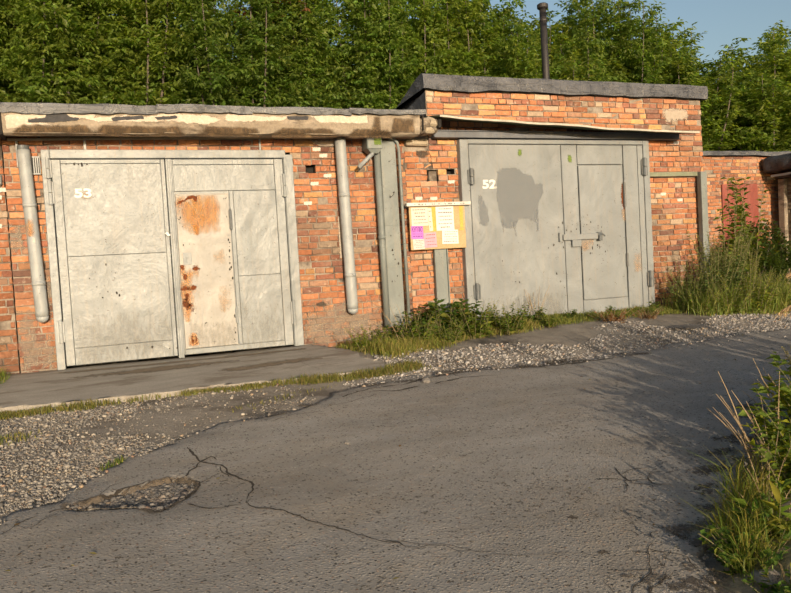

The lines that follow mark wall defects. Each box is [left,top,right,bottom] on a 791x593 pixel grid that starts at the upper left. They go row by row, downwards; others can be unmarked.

water stain [13,124,183,137]
water stain [200,127,259,137]
water stain [273,128,335,146]
rust [177,195,218,234]
rust [180,265,200,321]
crack [187,447,254,501]
crack [632,543,652,593]